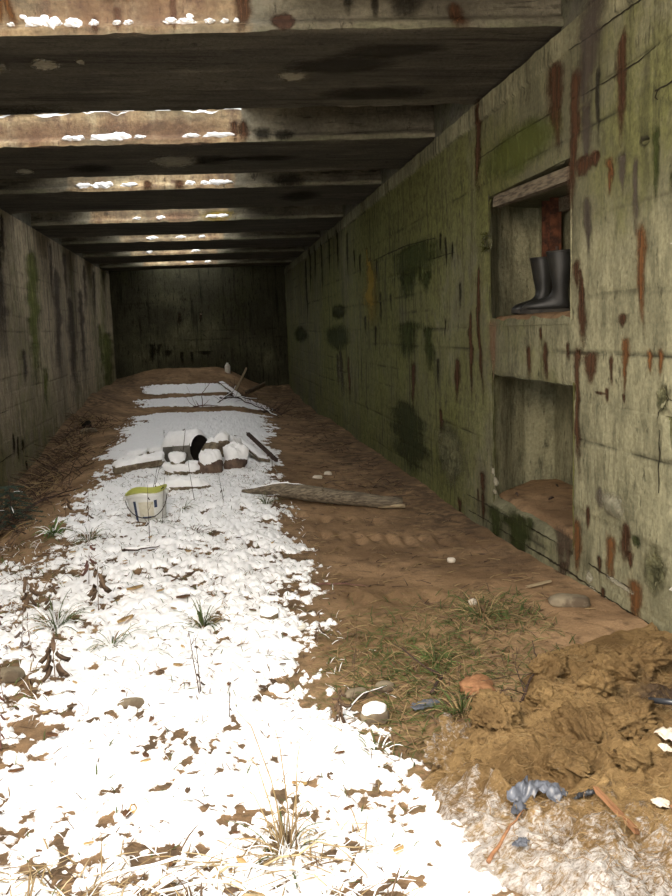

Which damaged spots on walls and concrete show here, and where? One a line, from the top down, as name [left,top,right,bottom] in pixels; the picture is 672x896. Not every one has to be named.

corrosion [0,0,17,24]
crack [569,0,641,50]
corrosion [616,31,627,129]
corrosion [546,61,614,206]
corrosion [637,226,647,319]
corrosion [539,328,548,379]
corrosion [566,260,597,456]
corrosion [595,338,629,403]